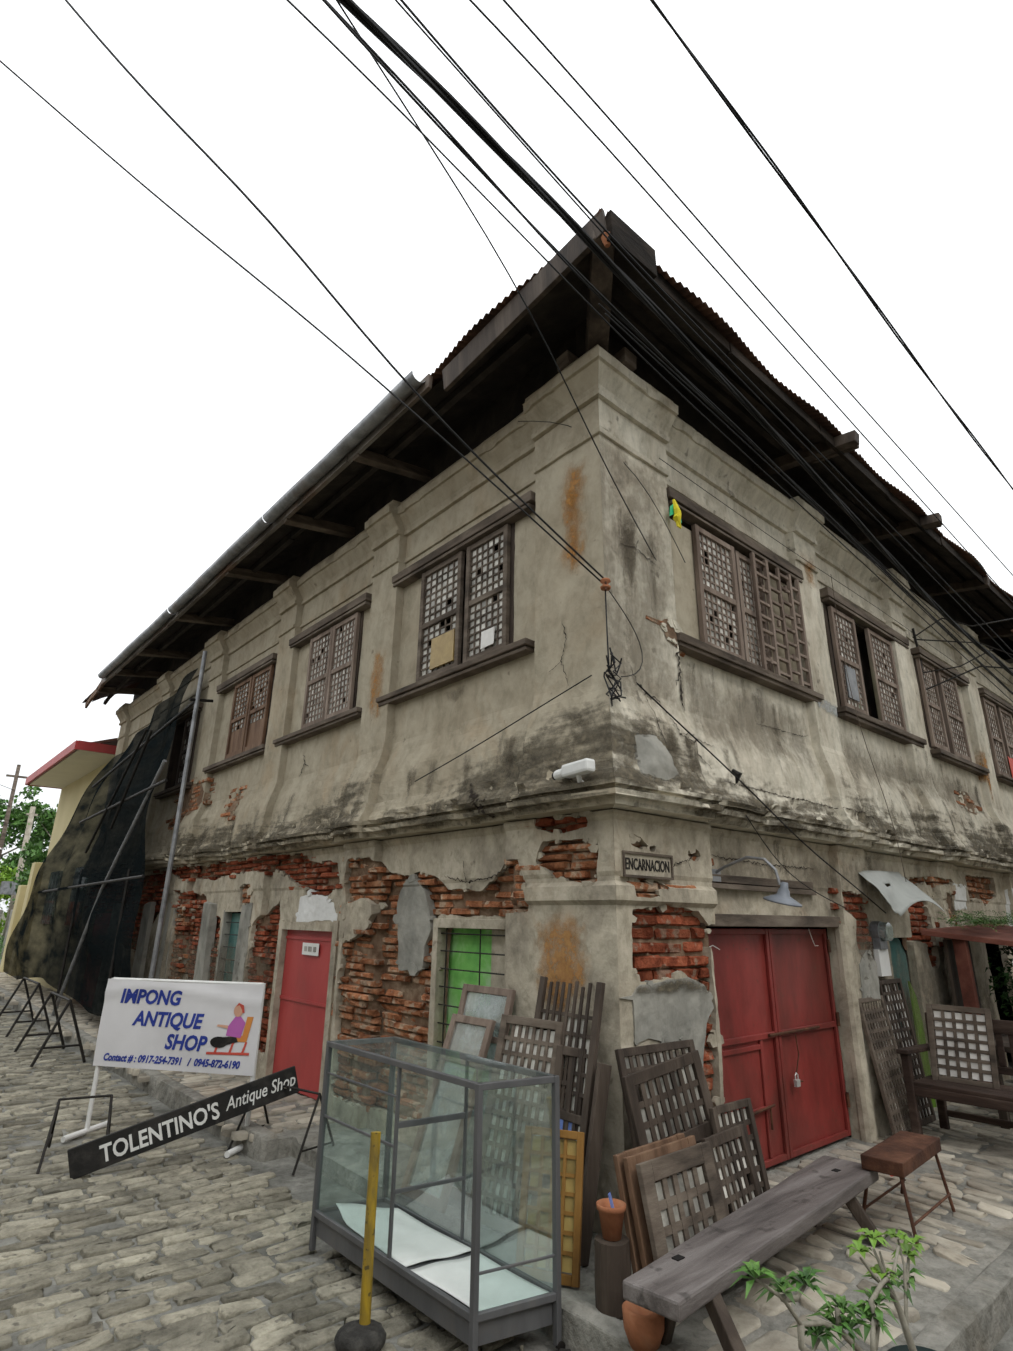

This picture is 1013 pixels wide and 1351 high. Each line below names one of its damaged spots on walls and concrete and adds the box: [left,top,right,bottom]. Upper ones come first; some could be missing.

spalling [166,777,247,830]
leakage [163,782,364,862]
leakage [381,703,1013,872]
flaking render [131,811,651,1120]
flaking render [615,877,725,1106]
flaking render [901,874,996,967]